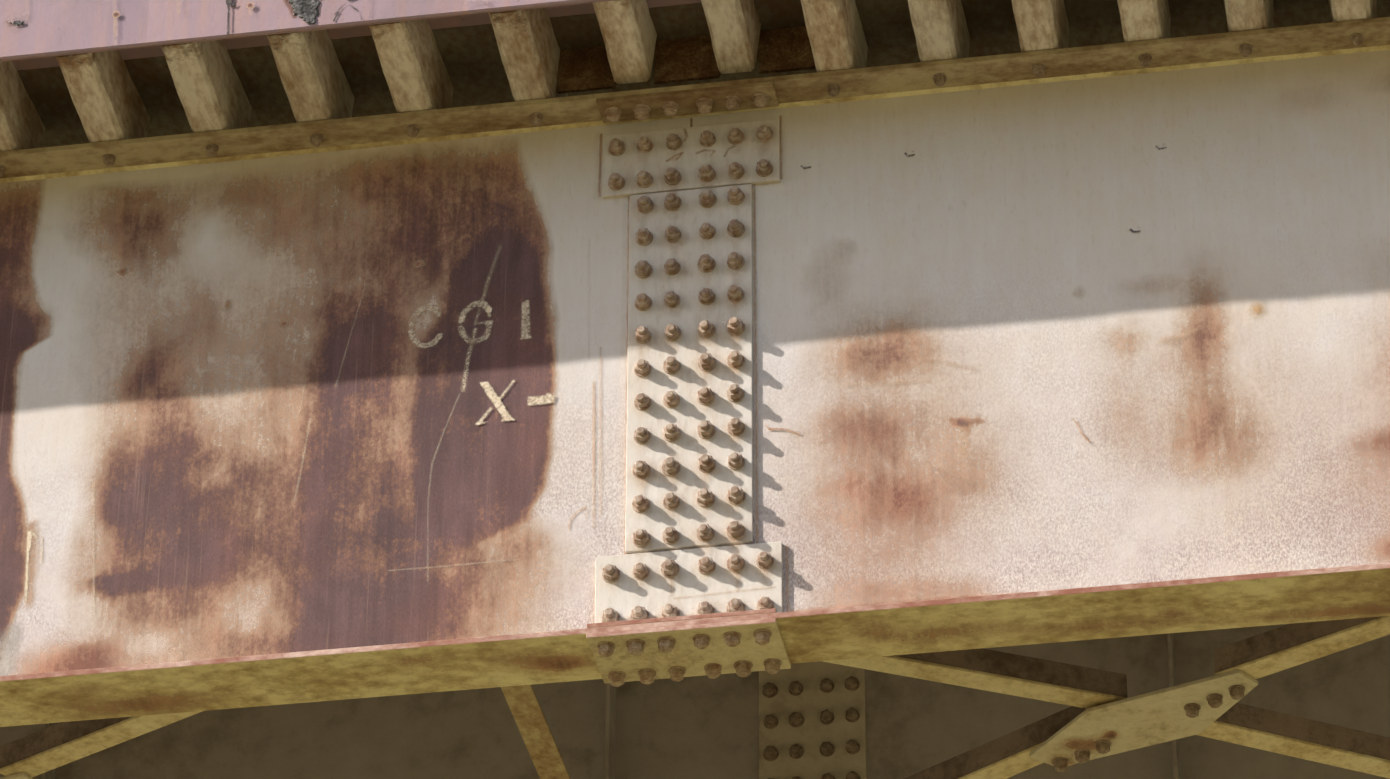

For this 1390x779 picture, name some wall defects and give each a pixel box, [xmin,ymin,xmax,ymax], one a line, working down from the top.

spalling [283,0,362,25]
corrosion [0,183,50,659]
corrosion [19,149,556,675]
corrosion [809,320,991,610]
corrosion [86,695,196,713]
corrosion [505,654,590,672]